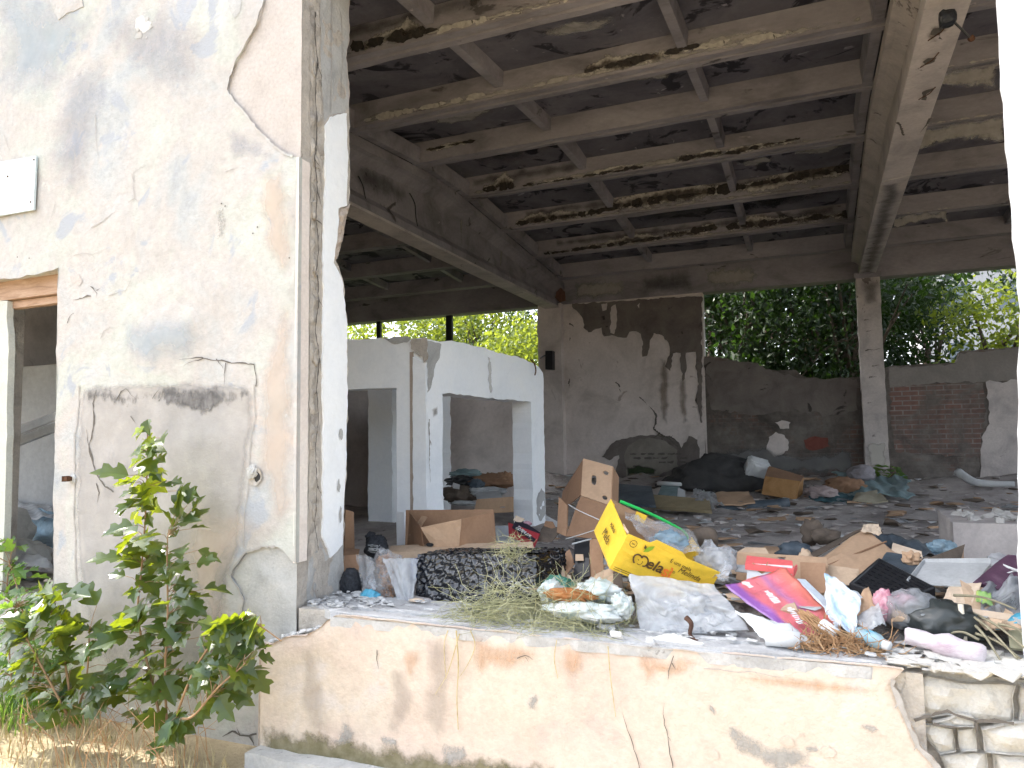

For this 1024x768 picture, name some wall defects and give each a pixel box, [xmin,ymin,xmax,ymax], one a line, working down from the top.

spalling [364,28,812,123]
spalling [918,57,999,100]
spalling [677,137,801,165]
spalling [920,112,1003,148]
spalling [516,164,862,226]
spalling [544,210,856,255]
water stain [164,388,225,412]
crack [180,357,257,386]
crack [615,382,678,447]
flaking render [555,288,858,456]
flaking render [888,348,1019,477]
spalling [922,671,1024,768]